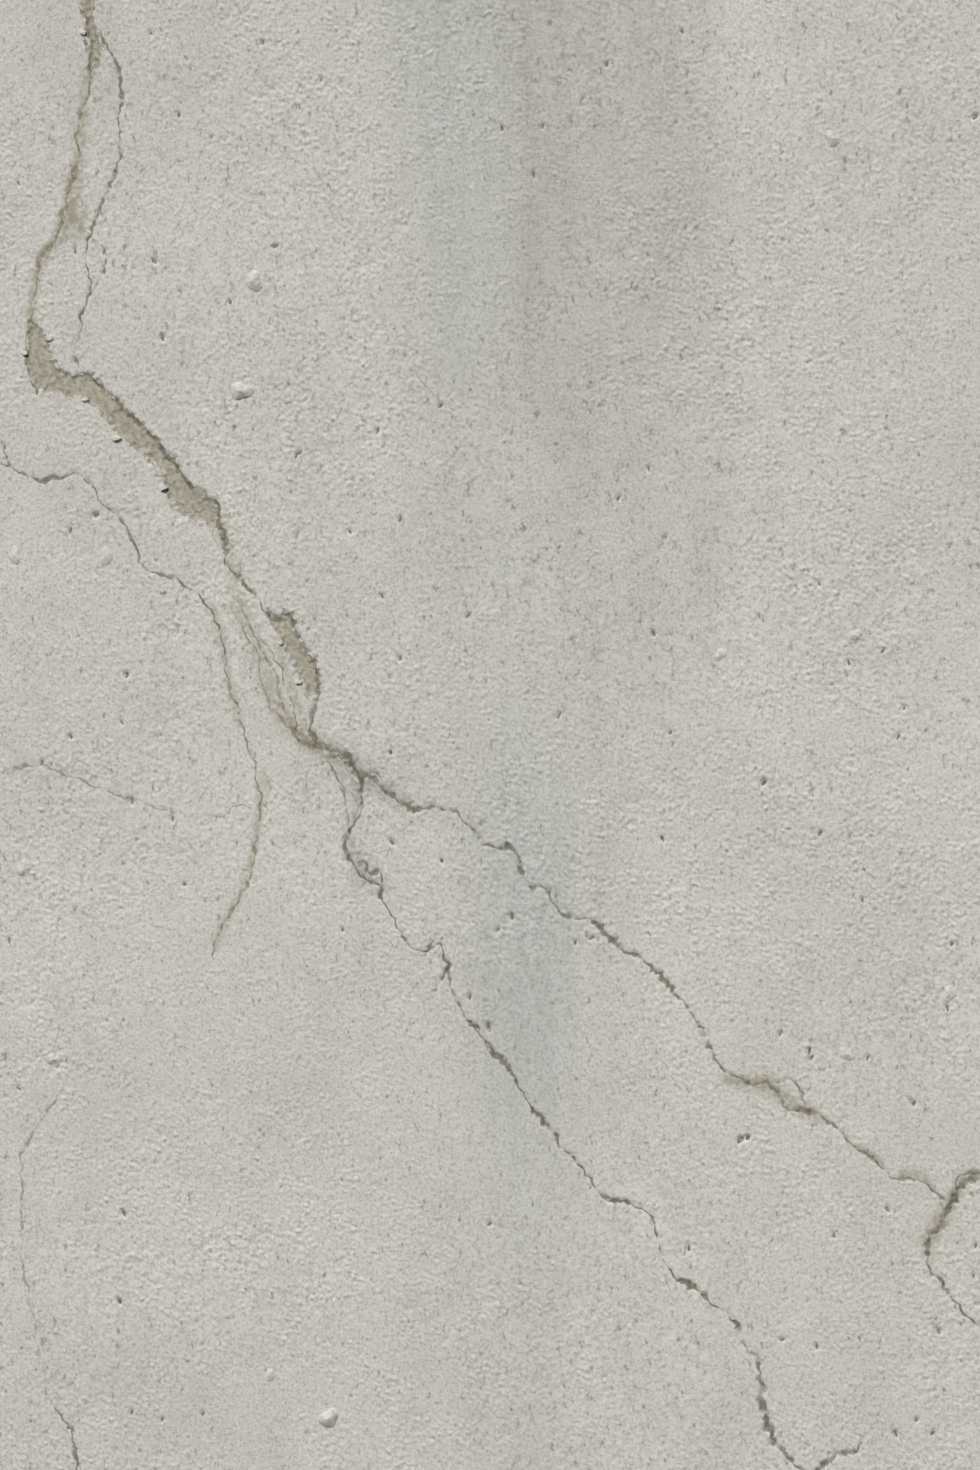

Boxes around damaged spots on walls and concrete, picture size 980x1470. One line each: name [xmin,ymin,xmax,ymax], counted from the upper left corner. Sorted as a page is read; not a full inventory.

crack [25,3,124,385]
crack [1,356,977,1470]